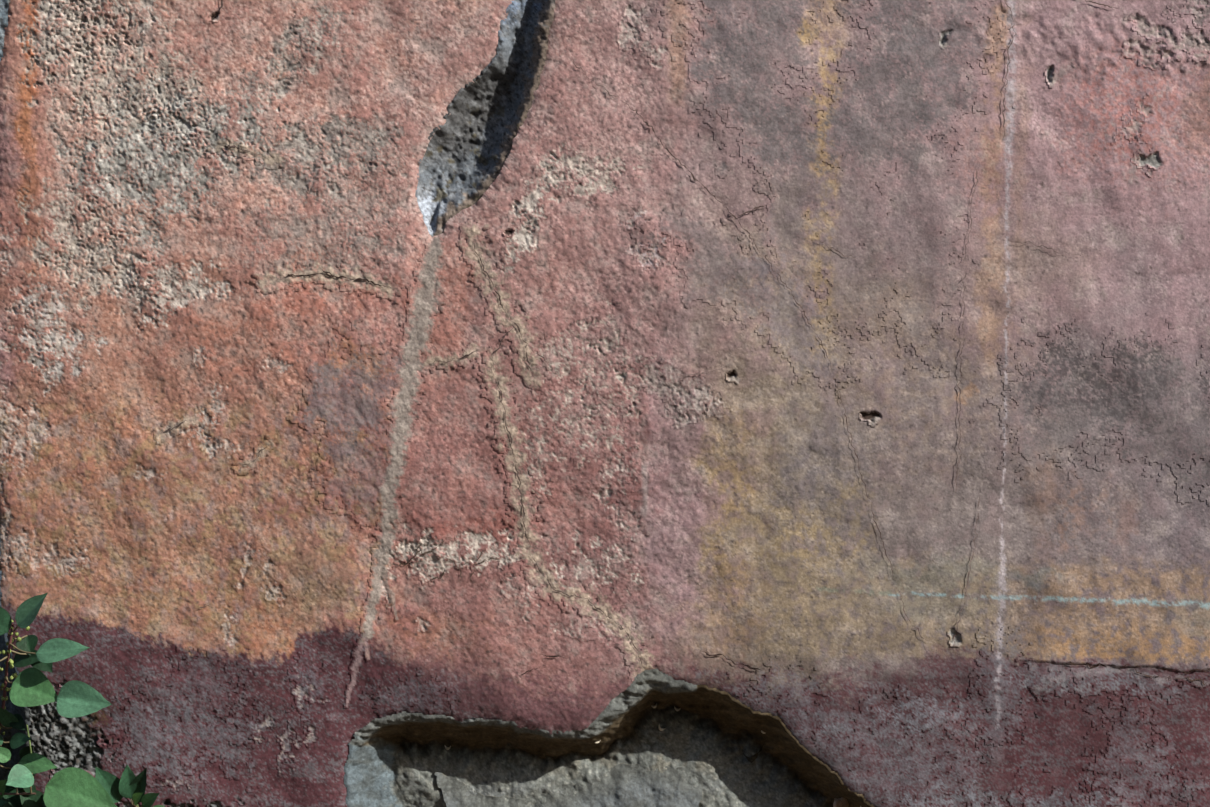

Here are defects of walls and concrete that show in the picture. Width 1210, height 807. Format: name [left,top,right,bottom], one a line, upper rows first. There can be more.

flaking render [0,0,555,608]
crack [571,60,980,646]
crack [251,217,661,708]
flaking render [514,296,735,605]
flaking render [383,522,621,647]
spalling [0,633,119,793]
damp [94,645,330,804]
peeling [252,674,333,777]
damp [360,667,462,718]
spalling [344,669,874,807]
damp [736,621,1210,807]
crack [1030,658,1210,697]